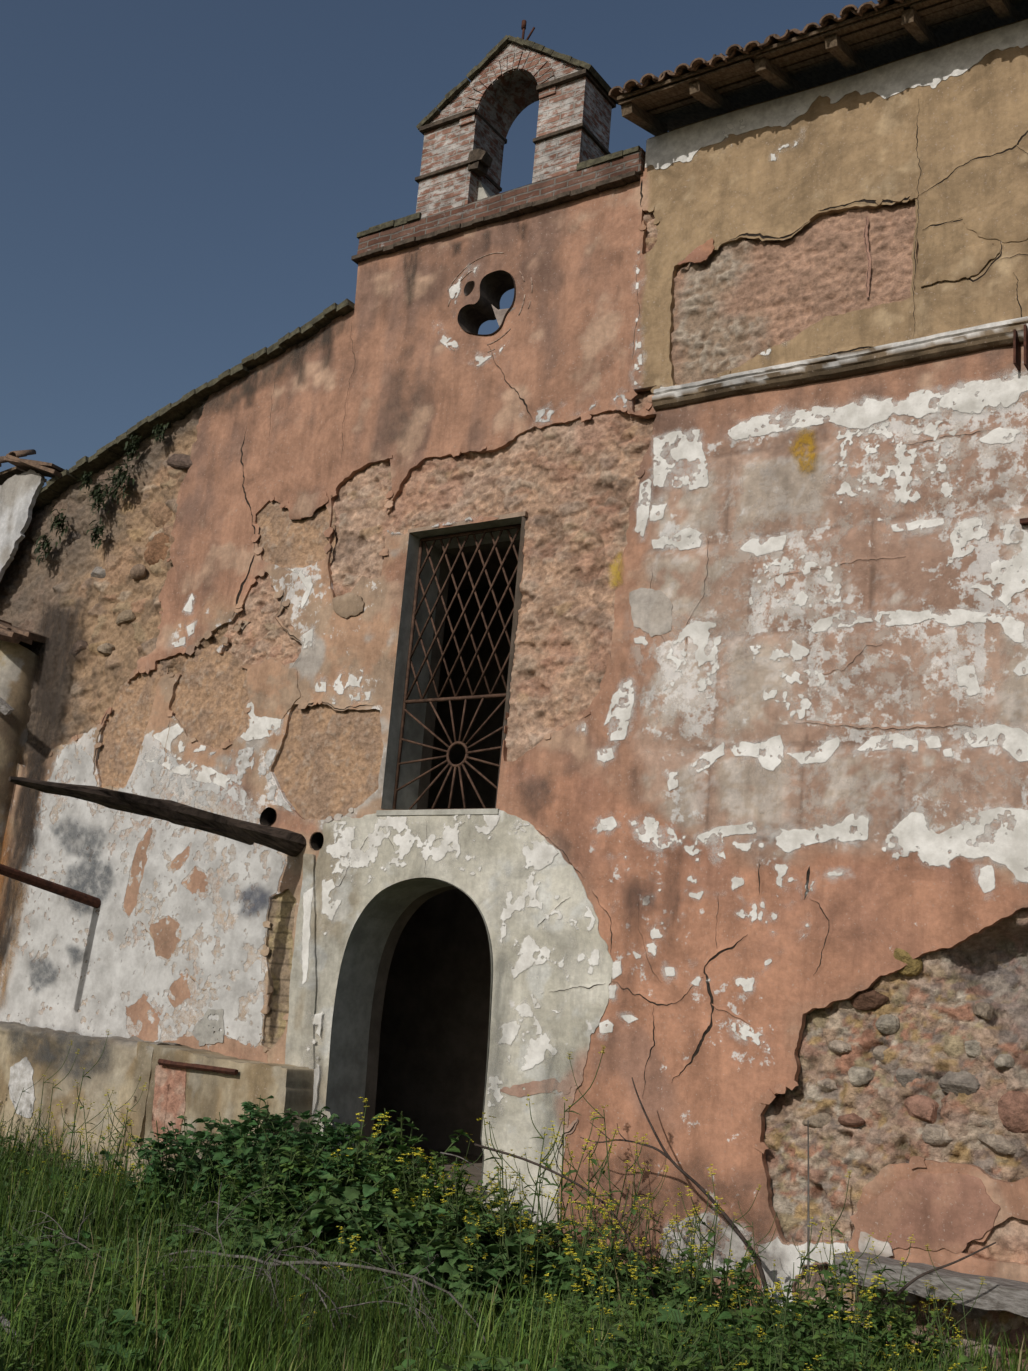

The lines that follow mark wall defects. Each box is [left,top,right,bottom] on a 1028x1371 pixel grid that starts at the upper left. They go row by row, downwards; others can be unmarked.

crack [729,99,1028,340]
crack [809,343,879,358]
crack [232,423,259,617]
spalling [0,193,919,1063]
peeling [728,373,1028,719]
peeling [857,723,1028,762]
peeling [882,807,1028,893]
peeling [307,1012,323,1115]
peeling [487,990,581,1107]
crack [535,828,751,1099]
spalling [660,909,1028,1371]